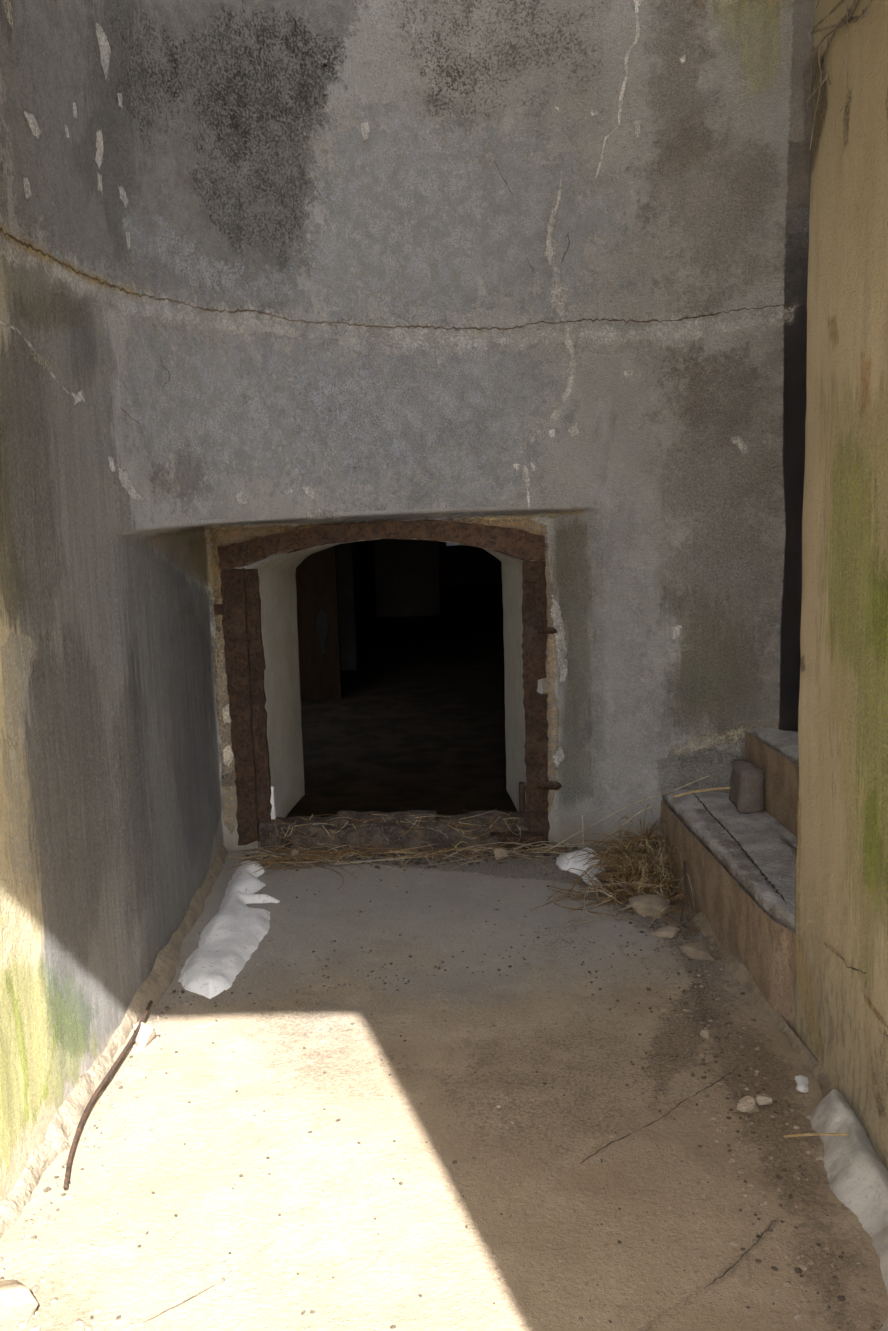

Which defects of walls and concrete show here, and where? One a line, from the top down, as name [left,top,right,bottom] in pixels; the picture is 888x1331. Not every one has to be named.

peeling [96,23,111,78]
peeling [24,111,41,138]
peeling [95,130,103,194]
peeling [119,186,128,207]
crack [0,227,807,386]
damp [0,0,647,1053]
rust [447,510,581,546]